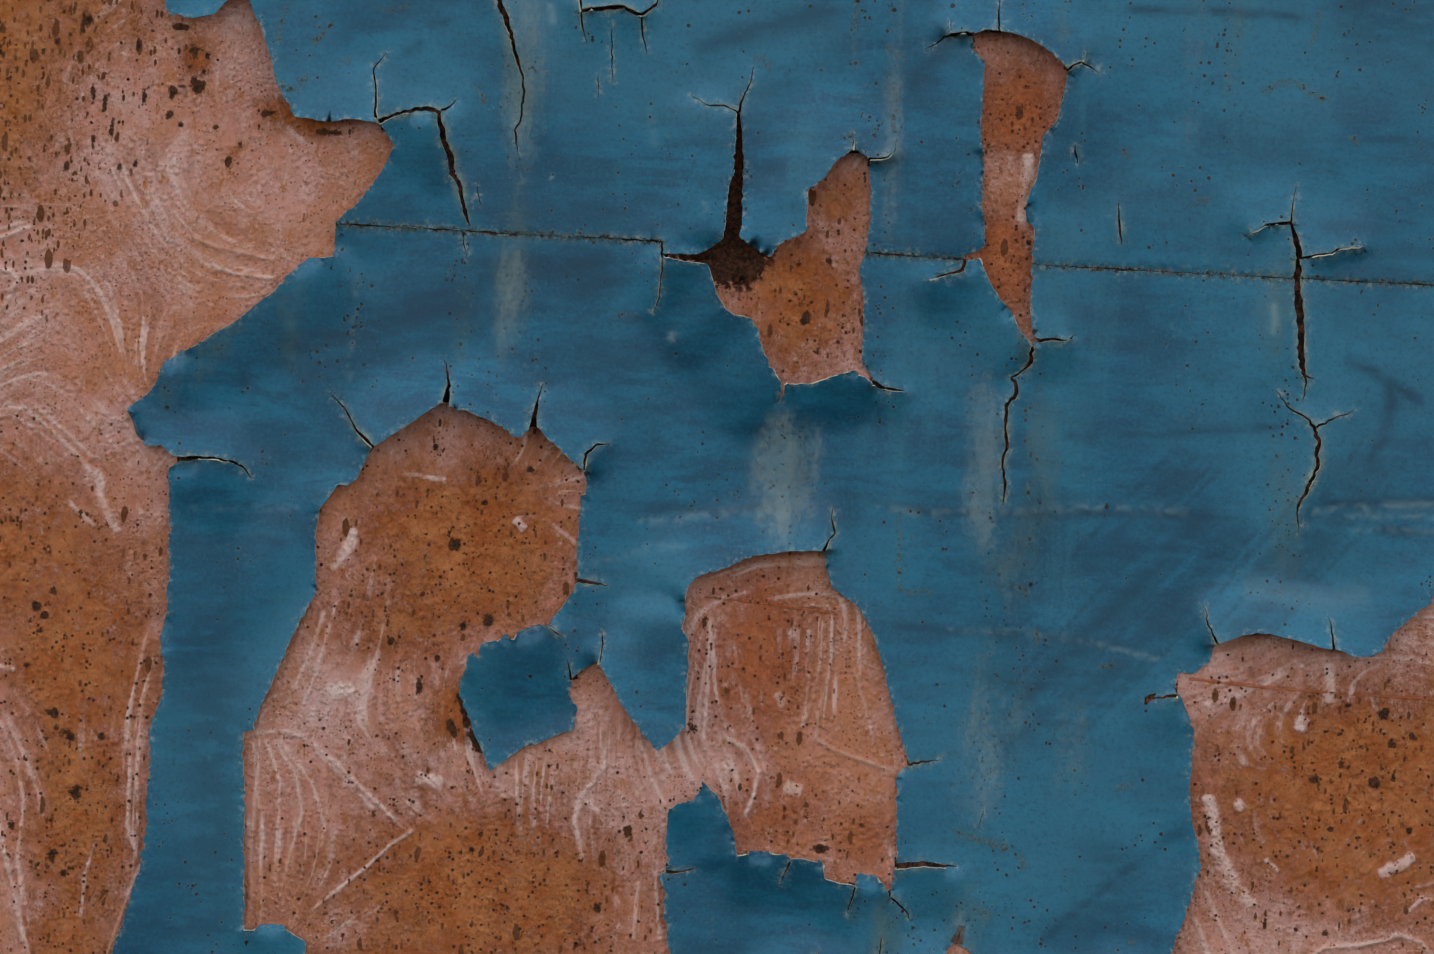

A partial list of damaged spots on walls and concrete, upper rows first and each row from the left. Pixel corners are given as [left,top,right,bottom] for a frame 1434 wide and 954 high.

rust [0,0,219,316]
peeling [0,0,454,954]
crack [373,52,481,256]
crack [497,0,526,156]
crack [570,0,658,96]
peeling [633,88,907,442]
crack [1222,176,1380,530]
rust [0,459,165,954]
rust [292,404,664,954]
peeling [215,357,972,954]
peeling [1098,513,1434,954]
rust [1176,639,1434,946]